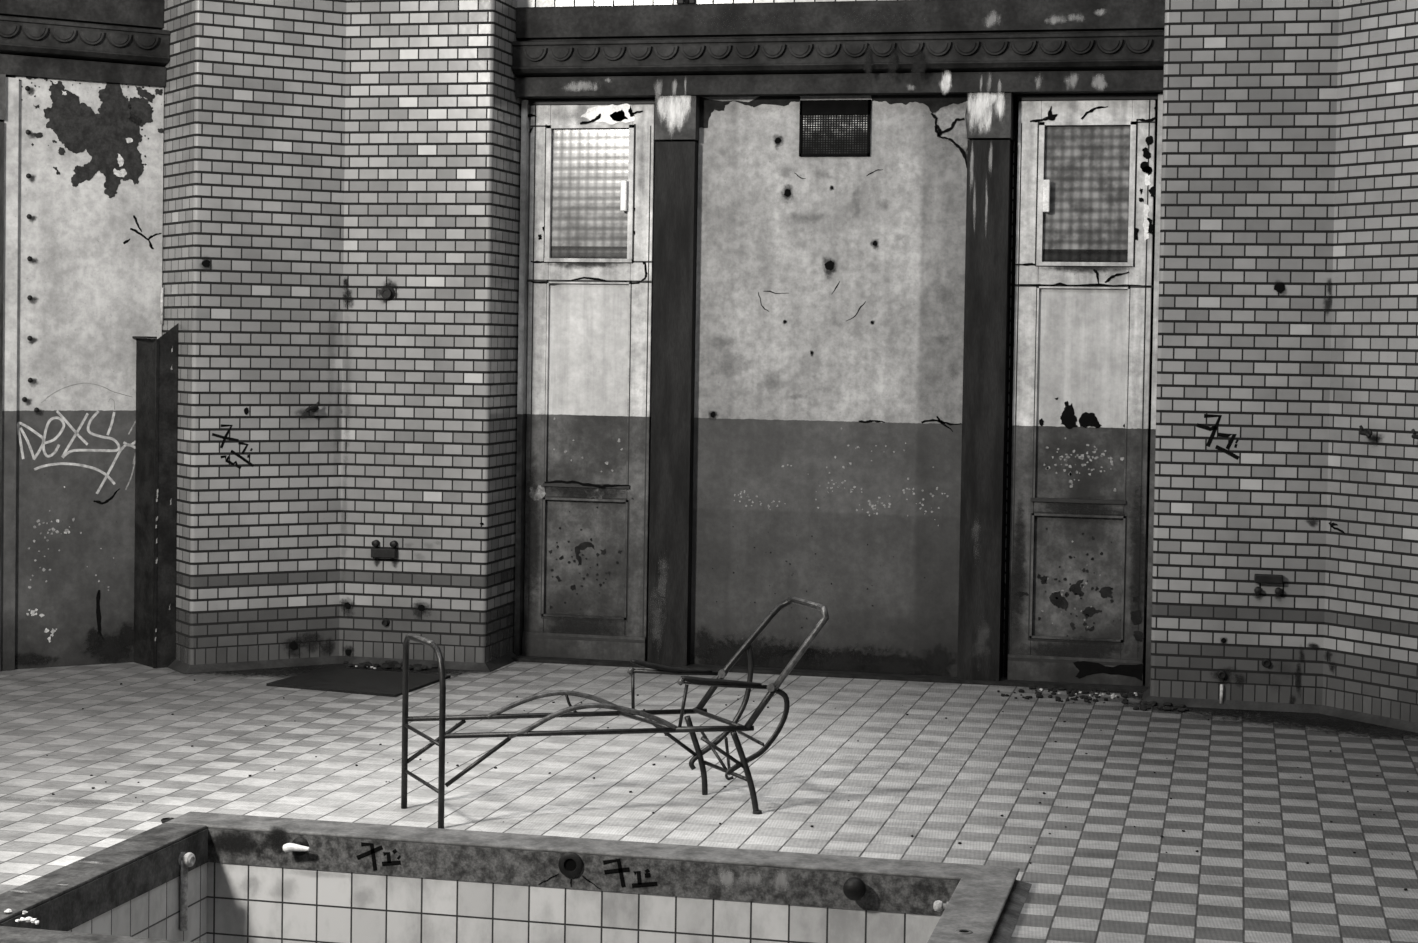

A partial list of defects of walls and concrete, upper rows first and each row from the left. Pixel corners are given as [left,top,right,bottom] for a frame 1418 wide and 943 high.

peeling [19,76,165,198]
crack [931,113,967,168]
crack [123,215,162,249]
peeling [1039,398,1124,488]
peeling [1020,533,1144,642]